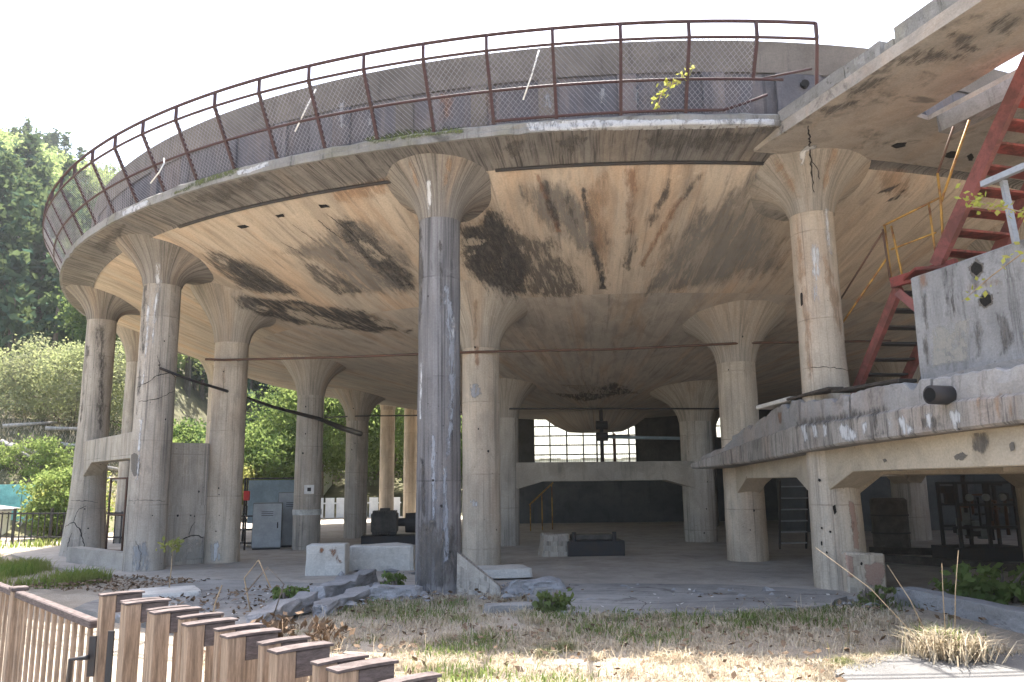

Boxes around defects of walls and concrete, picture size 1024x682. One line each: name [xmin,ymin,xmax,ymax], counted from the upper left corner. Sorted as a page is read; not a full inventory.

crack [807,126,820,192]
leakage [206,220,424,334]
leakage [460,211,582,298]
leakage [520,182,608,290]
crack [137,356,176,402]
crack [65,500,98,547]